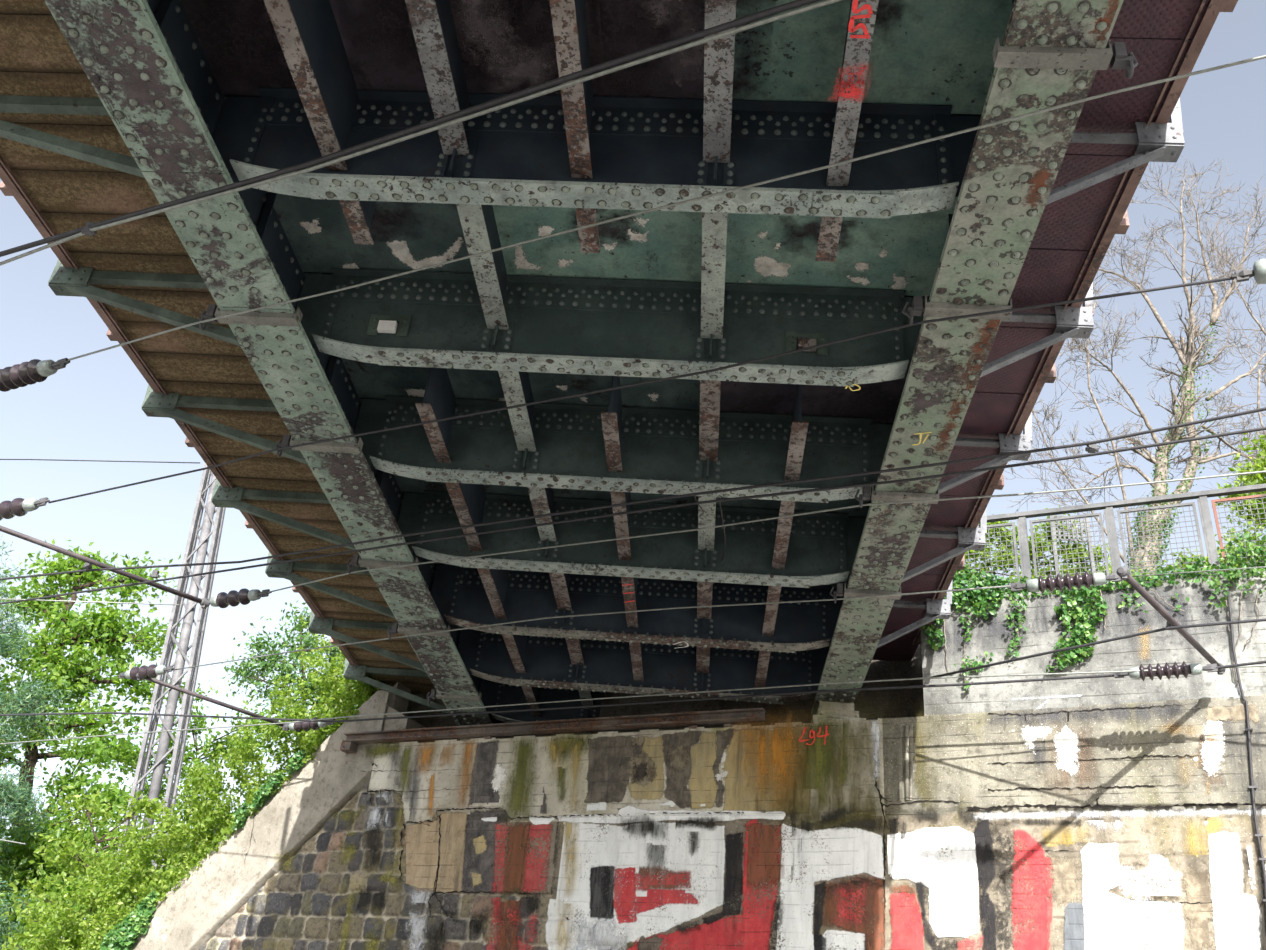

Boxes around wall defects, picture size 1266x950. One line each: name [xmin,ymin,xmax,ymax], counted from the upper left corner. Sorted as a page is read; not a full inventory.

peeling [386,237,463,270]
peeling [742,231,791,283]
leakage [367,752,418,827]
crack [362,763,765,926]
efflorescence [409,891,430,950]